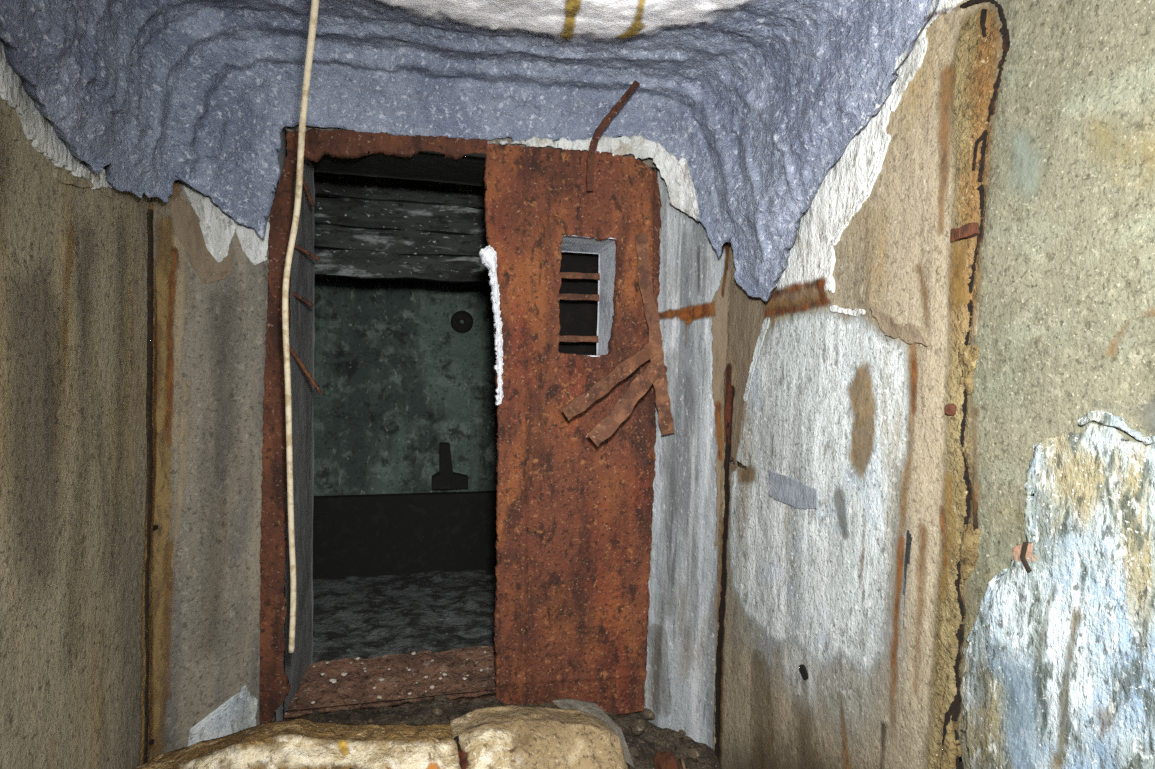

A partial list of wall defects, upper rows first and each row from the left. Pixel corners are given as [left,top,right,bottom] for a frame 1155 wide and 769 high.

flaking render [0,38,113,198]
flaking render [493,135,699,221]
peeling [179,180,270,265]
corrosion [659,303,715,325]
corrosion [765,278,829,318]
crack [942,0,1010,769]
peeling [960,410,1155,769]